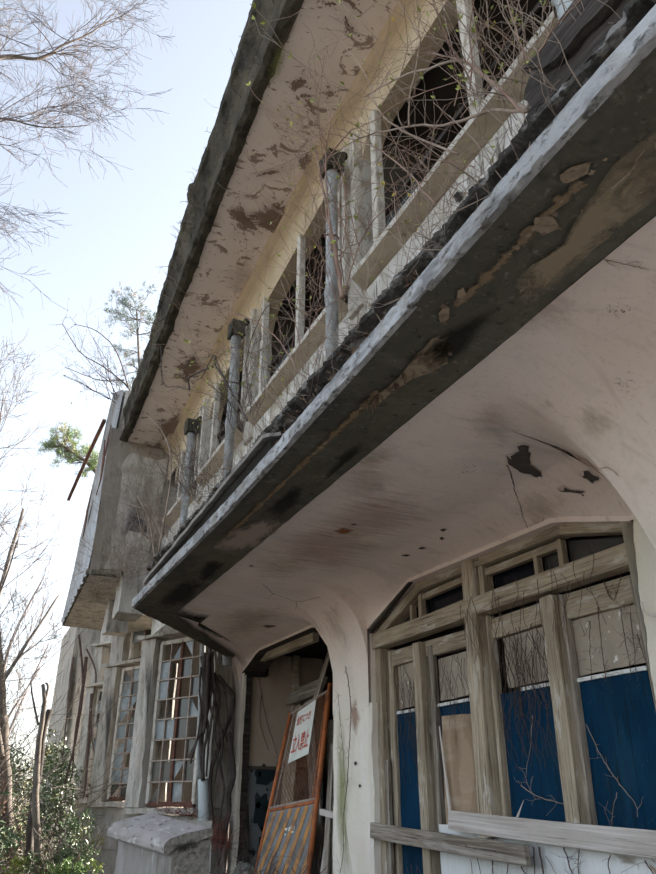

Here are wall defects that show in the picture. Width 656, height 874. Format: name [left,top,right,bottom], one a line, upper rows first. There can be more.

flaking render [560,162,591,183]
flaking render [532,211,562,235]
flaking render [438,287,466,325]
flaking render [366,337,457,413]
corrosion [227,390,380,536]
peeling [505,443,542,477]
crack [490,420,619,476]
peeling [557,468,601,496]